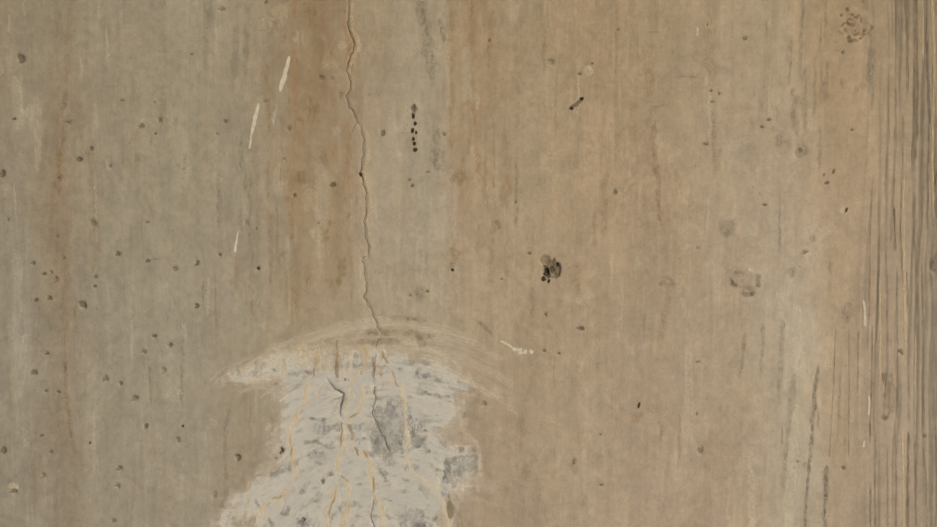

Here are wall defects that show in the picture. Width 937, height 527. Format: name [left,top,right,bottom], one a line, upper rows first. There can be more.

crack [346,0,388,449]
crack [329,340,346,442]
peeling [217,343,489,527]